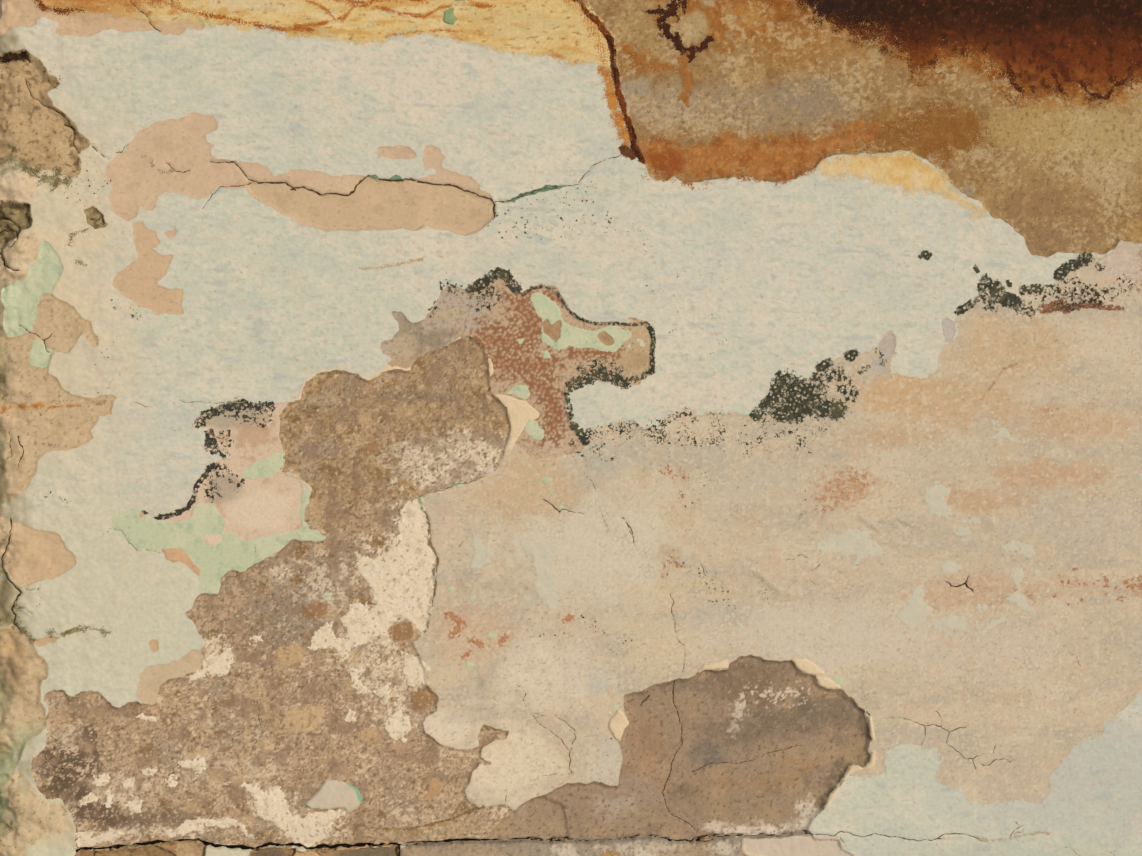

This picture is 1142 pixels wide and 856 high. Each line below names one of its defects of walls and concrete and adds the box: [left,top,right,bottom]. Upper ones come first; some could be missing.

peeling [84,112,563,316]
crack [167,153,624,218]
corrosion [33,0,1142,220]
damp [954,251,1135,319]
damp [142,396,275,520]
peeling [380,0,1142,843]
spalling [0,336,857,856]
crack [35,721,77,782]
crack [76,593,1024,856]